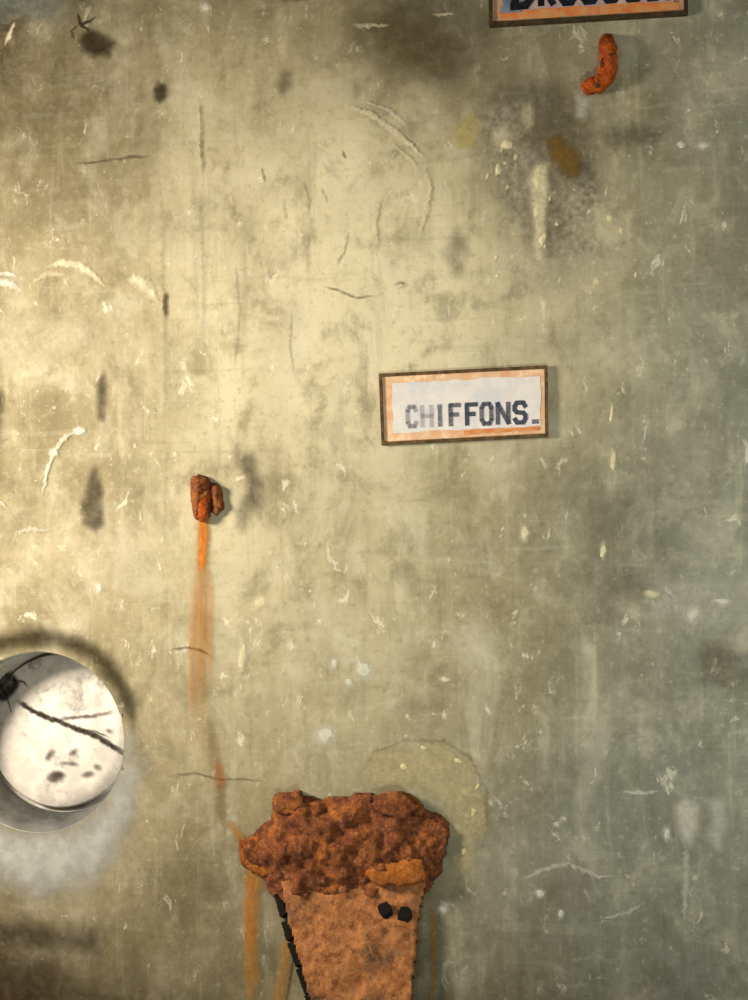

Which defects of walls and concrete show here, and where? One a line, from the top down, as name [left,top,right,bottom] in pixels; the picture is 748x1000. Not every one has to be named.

damp [82,472,101,529]
corrosion [198,518,207,585]
corrosion [245,871,258,983]
corrosion [274,894,311,1000]